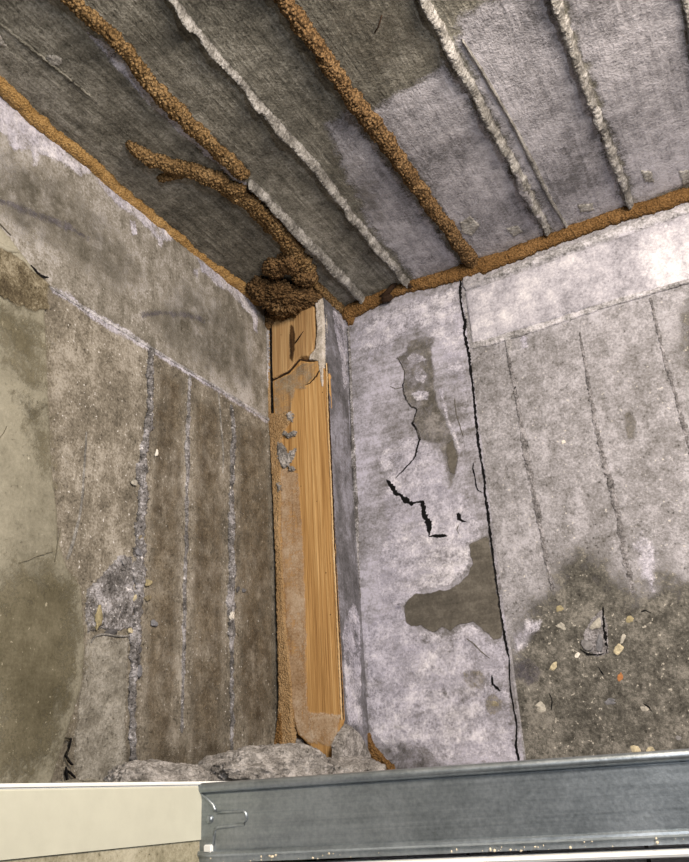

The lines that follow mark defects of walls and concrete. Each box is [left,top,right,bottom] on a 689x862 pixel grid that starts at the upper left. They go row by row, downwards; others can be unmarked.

spalling [0,243,50,311]
leakage [326,112,458,279]
leakage [374,0,689,258]
crack [386,357,460,538]
crack [454,280,520,761]
leakage [0,557,93,783]
spalling [580,607,609,657]